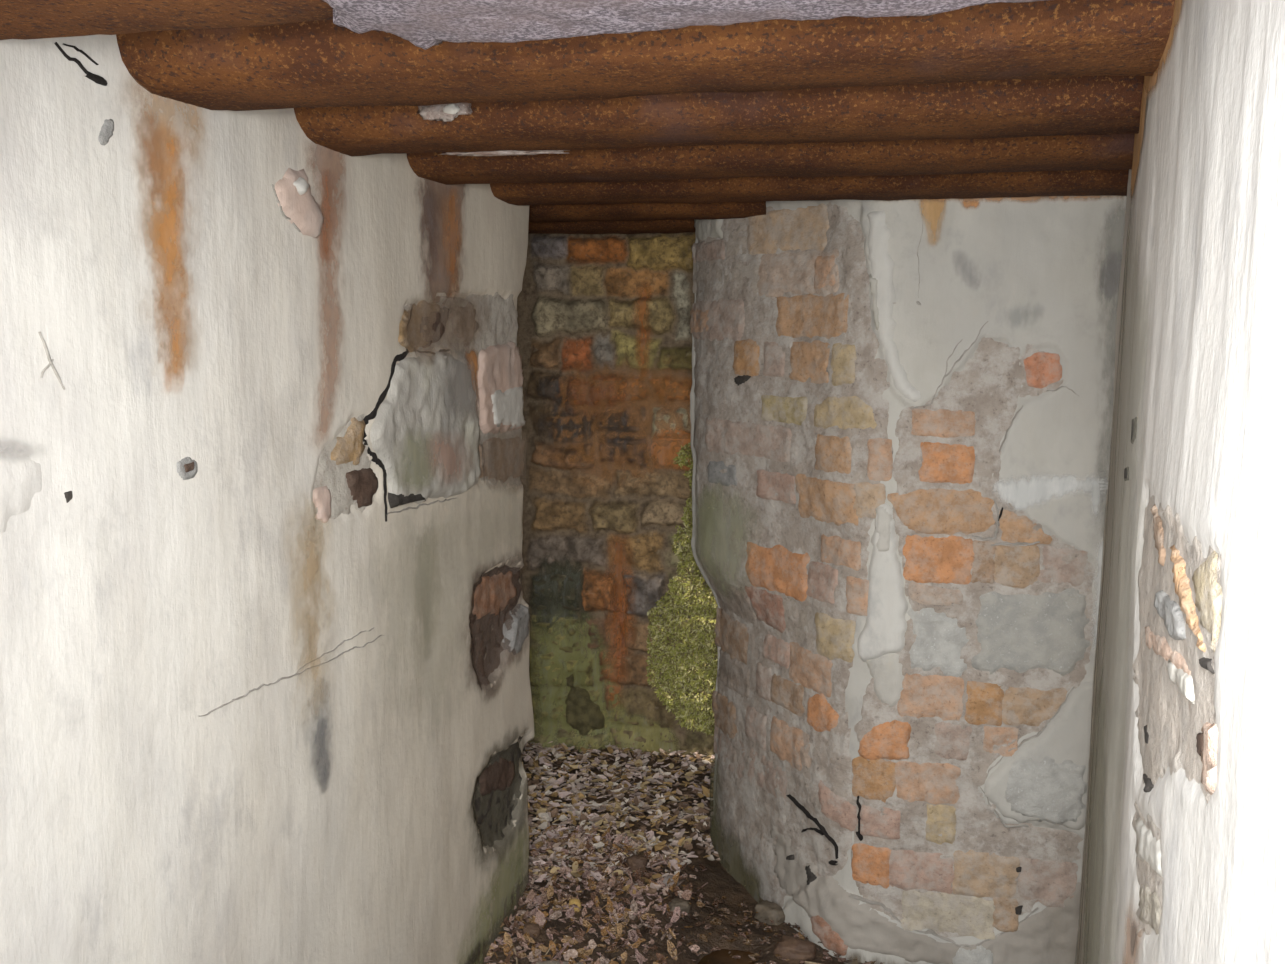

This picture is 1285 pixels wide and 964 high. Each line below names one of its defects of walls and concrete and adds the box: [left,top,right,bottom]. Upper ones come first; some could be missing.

corrosion [323,0,1049,50]
corrosion [417,103,472,122]
corrosion [144,94,200,370]
corrosion [420,178,465,303]
corrosion [921,195,1102,241]
spalling [398,292,526,486]
spalling [313,414,378,523]
spalling [690,202,1095,964]
spalling [1132,489,1223,803]
spalling [471,733,528,860]
crack [786,794,863,865]
crack [848,894,1038,947]